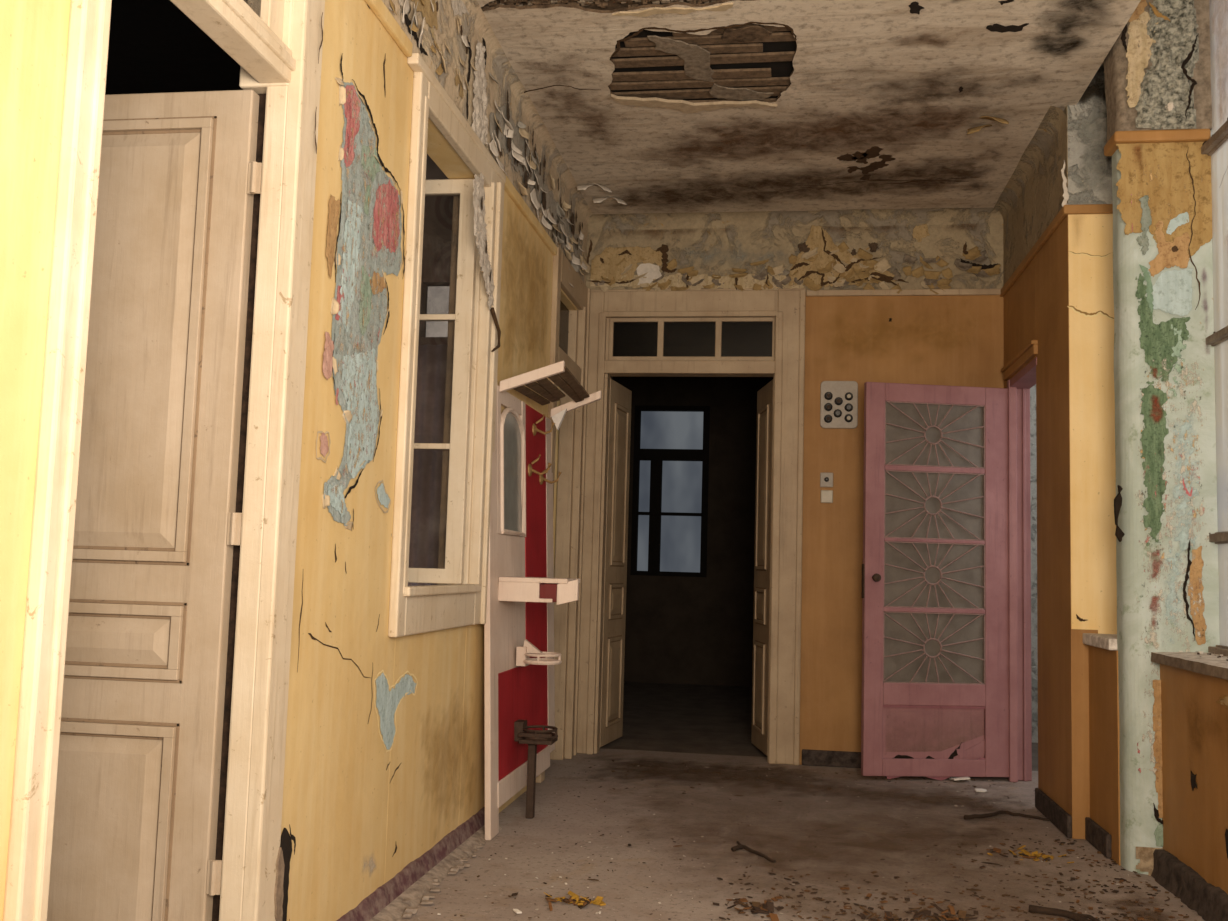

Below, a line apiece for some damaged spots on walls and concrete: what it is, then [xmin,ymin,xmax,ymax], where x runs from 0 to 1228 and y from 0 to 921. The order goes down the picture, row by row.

peeling [316,53,405,531]
crack [466,0,733,145]
flaking render [389,0,1001,294]
leakage [628,163,980,205]
leakage [676,79,979,166]
leakage [1038,0,1100,55]
spalling [1121,0,1199,130]
peeling [1131,145,1201,316]
peeling [1114,485,1125,542]
peeling [297,581,418,782]